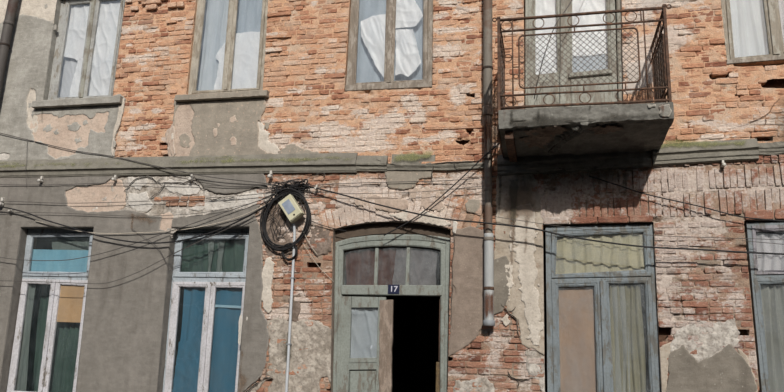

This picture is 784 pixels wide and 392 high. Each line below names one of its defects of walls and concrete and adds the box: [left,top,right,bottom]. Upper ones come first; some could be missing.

flaking render [0,0,8,23]
flaking render [16,0,57,30]
flaking render [27,89,109,159]
flaking render [113,0,196,158]
flaking render [258,0,484,164]
flaking render [492,0,524,250]
flaking render [622,0,784,144]
flaking render [66,154,784,392]